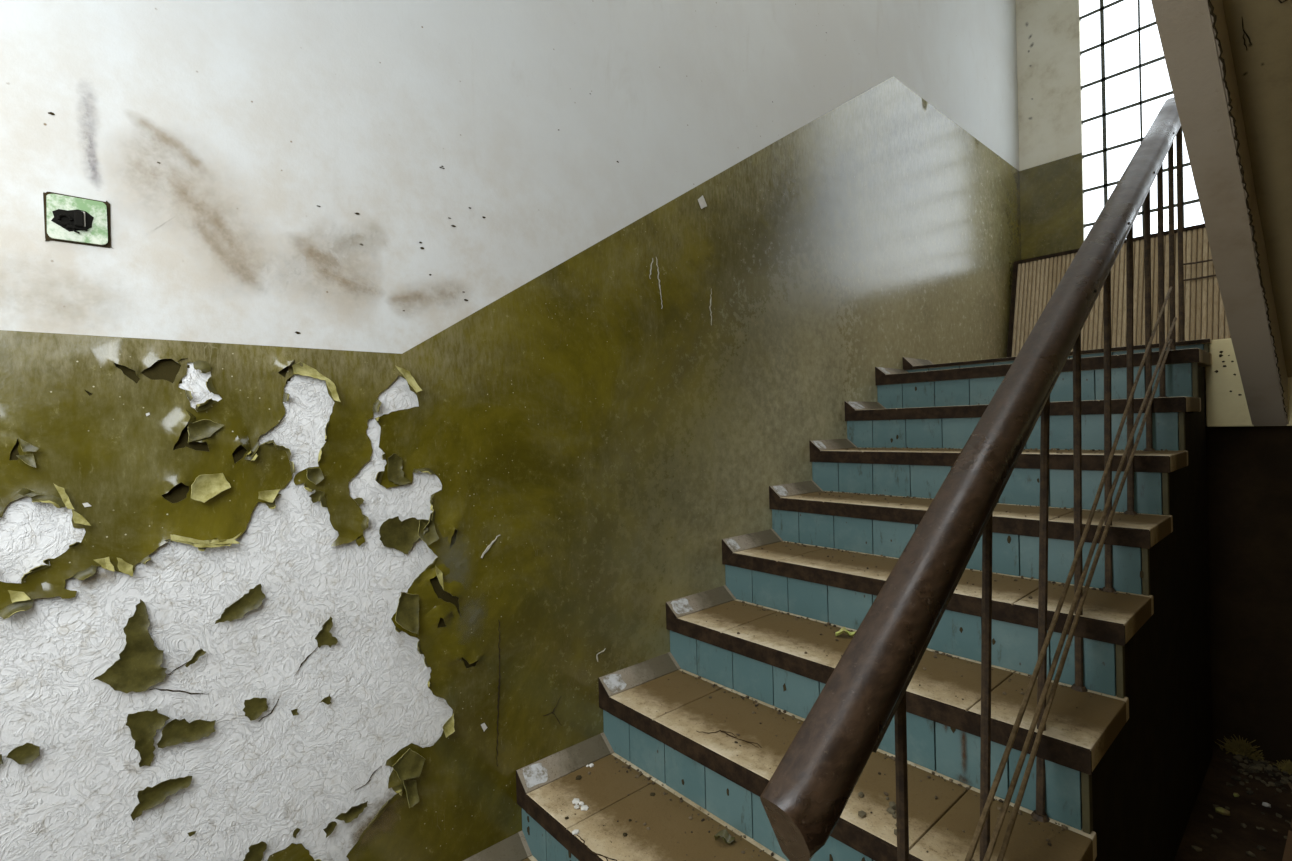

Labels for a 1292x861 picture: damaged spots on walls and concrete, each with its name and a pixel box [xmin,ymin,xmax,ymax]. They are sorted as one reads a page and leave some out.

crack [1208,0,1288,418]
peeling [0,360,455,861]
crack [577,835,617,861]